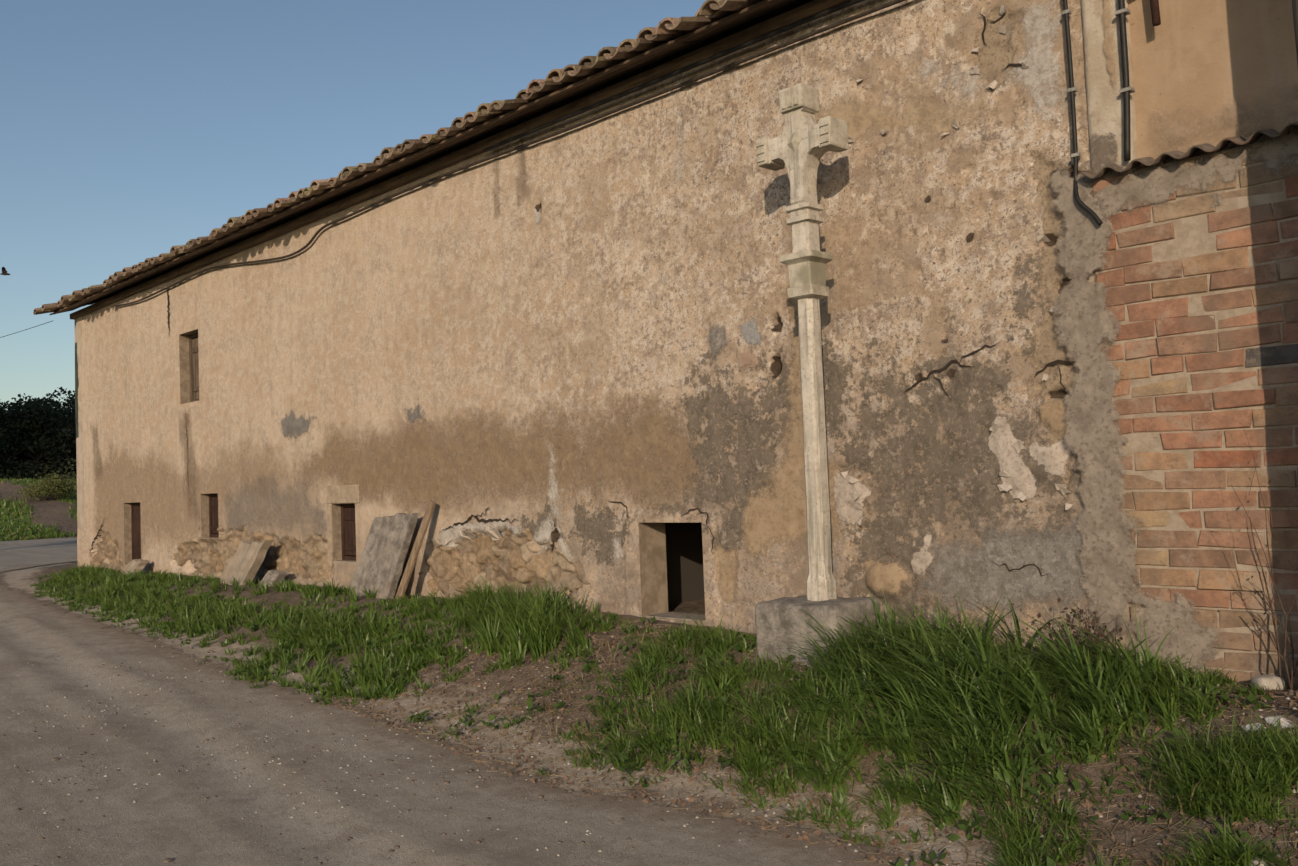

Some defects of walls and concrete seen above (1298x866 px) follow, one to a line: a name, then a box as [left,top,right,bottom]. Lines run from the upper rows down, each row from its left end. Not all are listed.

damp [95,341,800,570]
spalling [714,291,807,603]
peeling [827,459,871,535]
crack [903,342,1000,399]
damp [822,253,1082,631]
spalling [988,150,1085,510]
crack [1034,360,1075,393]